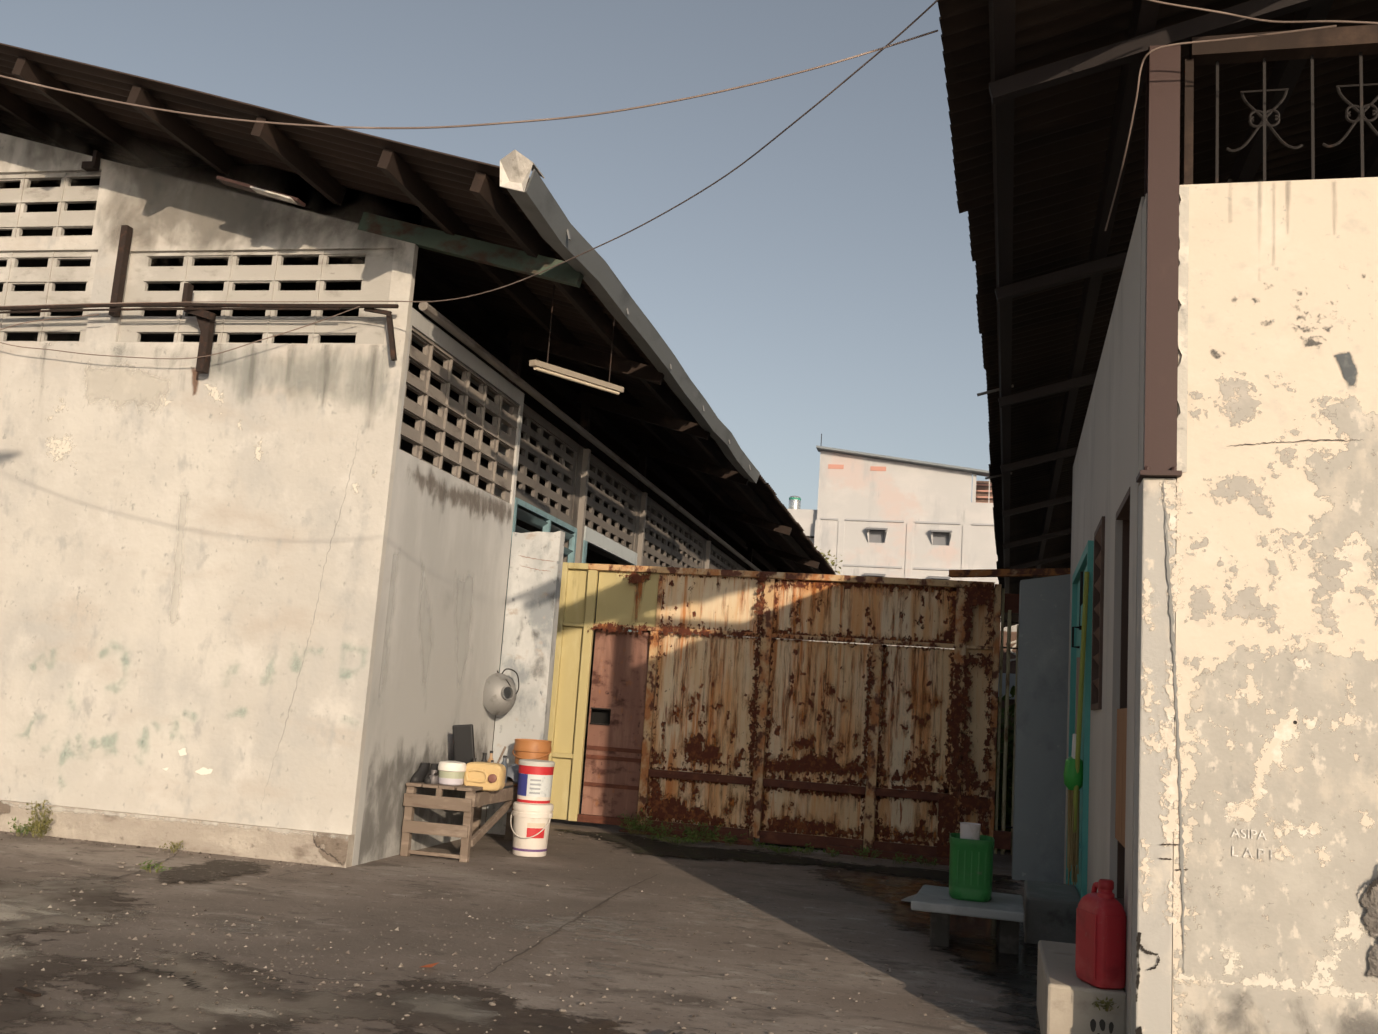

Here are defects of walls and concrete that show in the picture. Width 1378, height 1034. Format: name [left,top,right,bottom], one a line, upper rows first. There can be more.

peeling [1187,371,1296,428]
crack [260,435,358,811]
corrosion [587,571,996,858]
peeling [1138,395,1378,1034]
damp [0,874,648,1034]